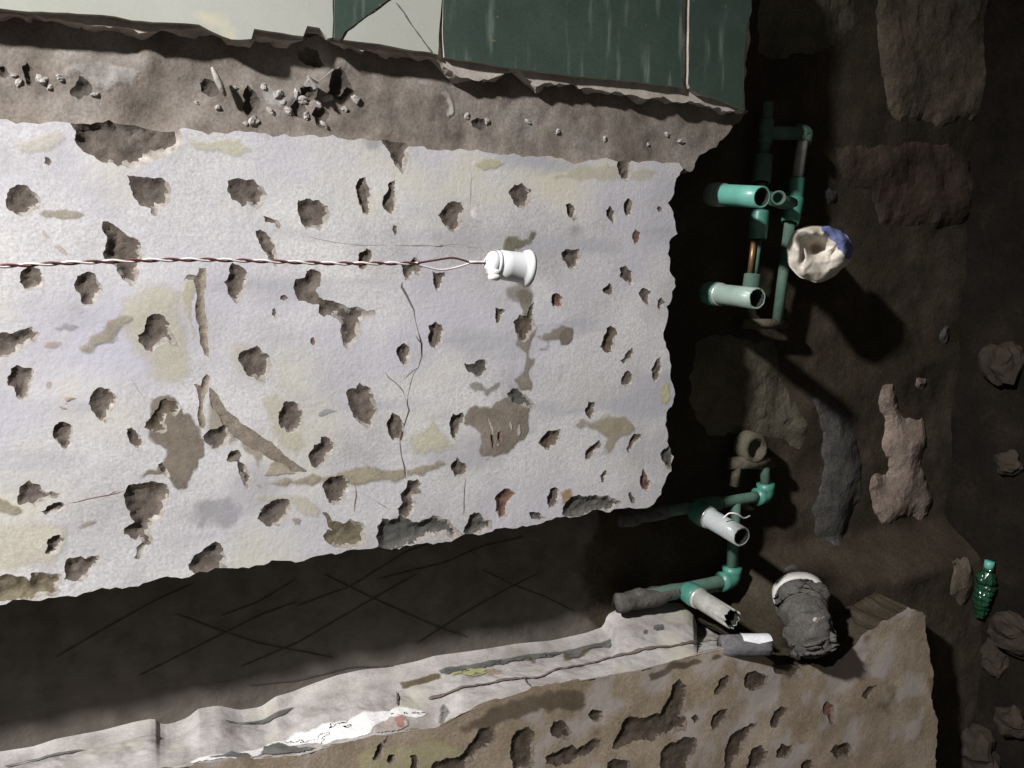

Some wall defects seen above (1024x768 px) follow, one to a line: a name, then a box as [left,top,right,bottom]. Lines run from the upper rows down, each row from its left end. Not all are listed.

spalling [69,76,93,100]
spalling [242,85,260,118]
spalling [291,47,352,128]
spalling [70,120,184,216]
spalling [102,221,143,287]
spalling [272,269,376,349]
crack [385,282,423,477]
peeling [449,388,535,456]
peeling [124,395,252,559]
spalling [322,475,516,549]
spalling [529,469,652,521]
spalling [0,535,101,601]